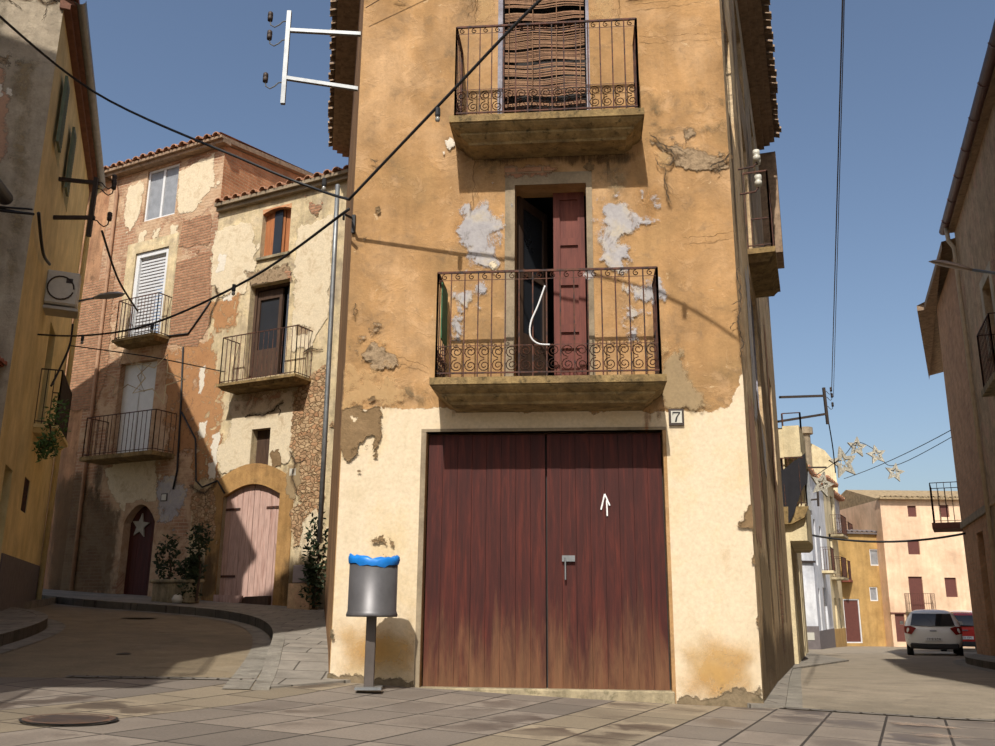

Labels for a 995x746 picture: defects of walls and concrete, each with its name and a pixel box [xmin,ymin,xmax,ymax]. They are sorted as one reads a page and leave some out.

flaking render [70,275,116,411]
peeling [452,282,487,341]
peeling [456,201,506,274]
peeling [593,190,667,340]
crack [643,31,745,355]
flaking render [104,322,405,563]
leakage [698,648,746,694]
leakage [761,511,795,700]